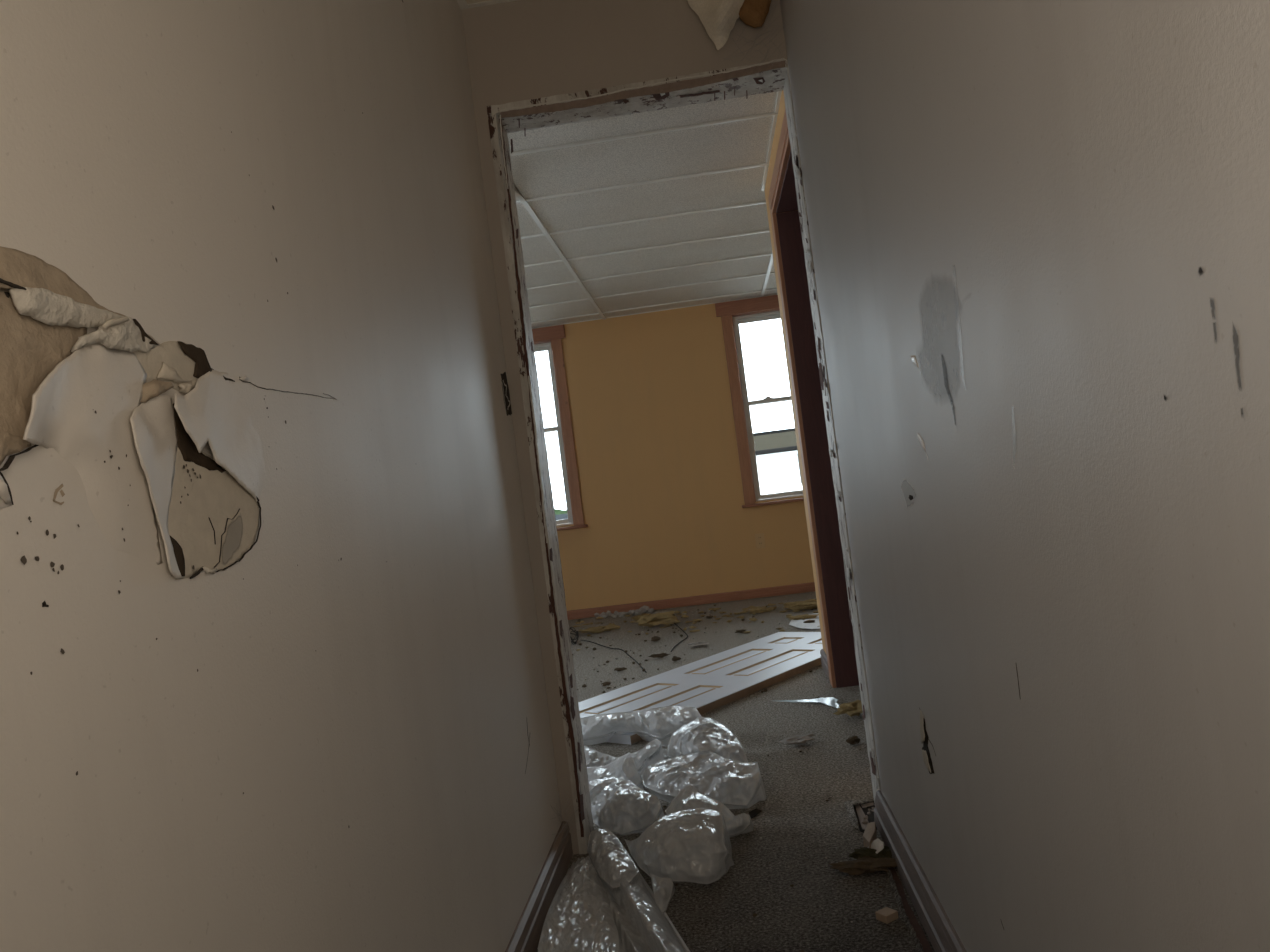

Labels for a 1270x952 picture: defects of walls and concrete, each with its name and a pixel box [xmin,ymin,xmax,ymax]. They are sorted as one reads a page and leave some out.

peeling [130,361,266,579]
peeling [499,58,786,837]